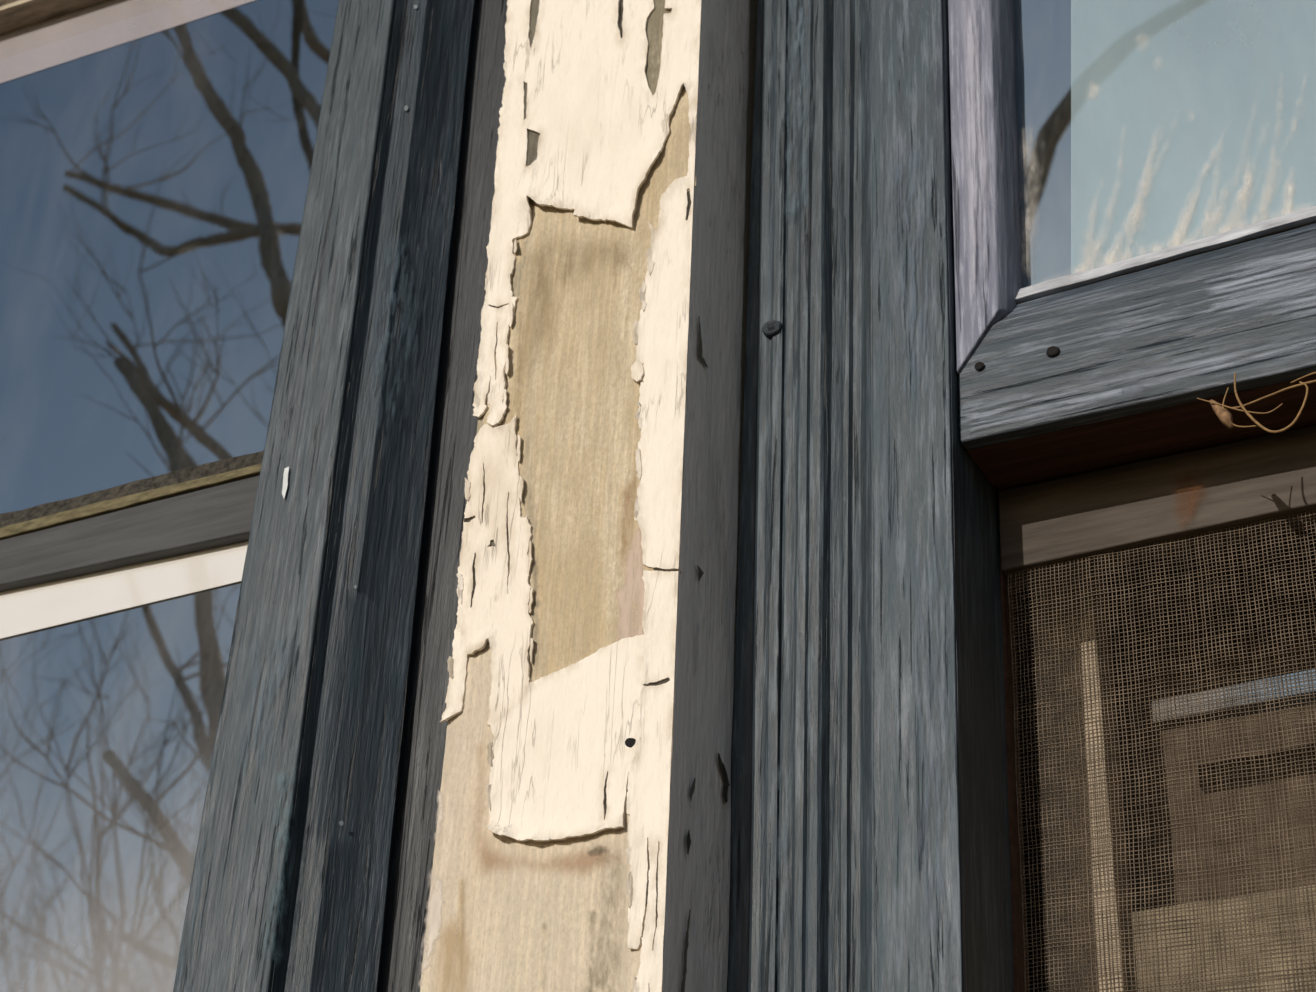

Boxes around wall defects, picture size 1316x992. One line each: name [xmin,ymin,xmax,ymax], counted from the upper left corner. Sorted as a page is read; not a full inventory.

peeling [529,0,540,46]
peeling [645,0,671,95]
peeling [420,82,696,992]
peeling [718,753,730,803]